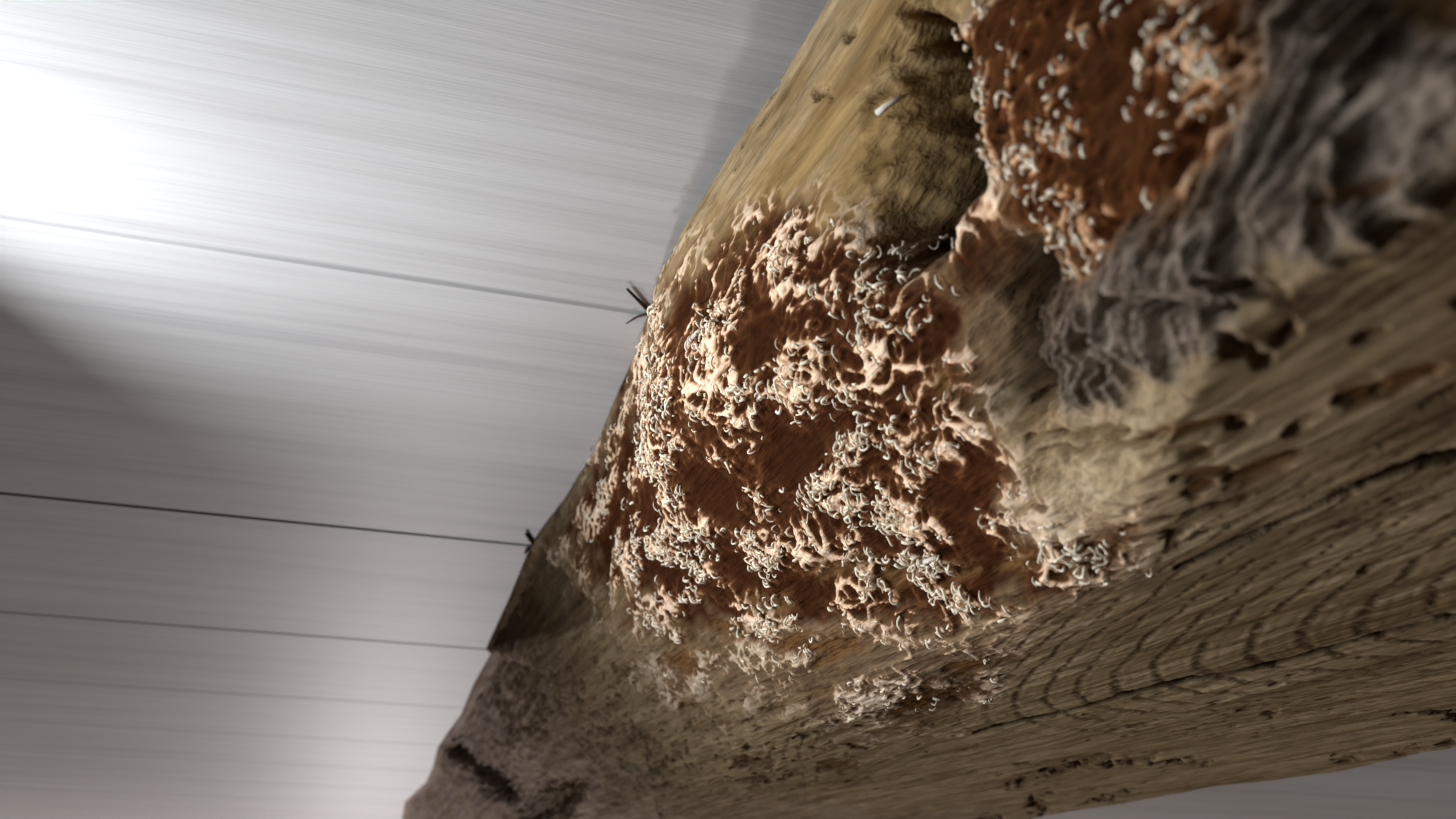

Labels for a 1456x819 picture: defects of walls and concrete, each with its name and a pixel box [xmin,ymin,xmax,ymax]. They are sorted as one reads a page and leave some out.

peeling [1067,0,1131,48]
peeling [1123,1,1236,154]
peeling [952,0,1107,279]
peeling [1142,187,1153,208]
peeling [583,207,1013,684]
peeling [975,483,1153,587]
peeling [836,658,999,726]
crack [972,613,1456,736]